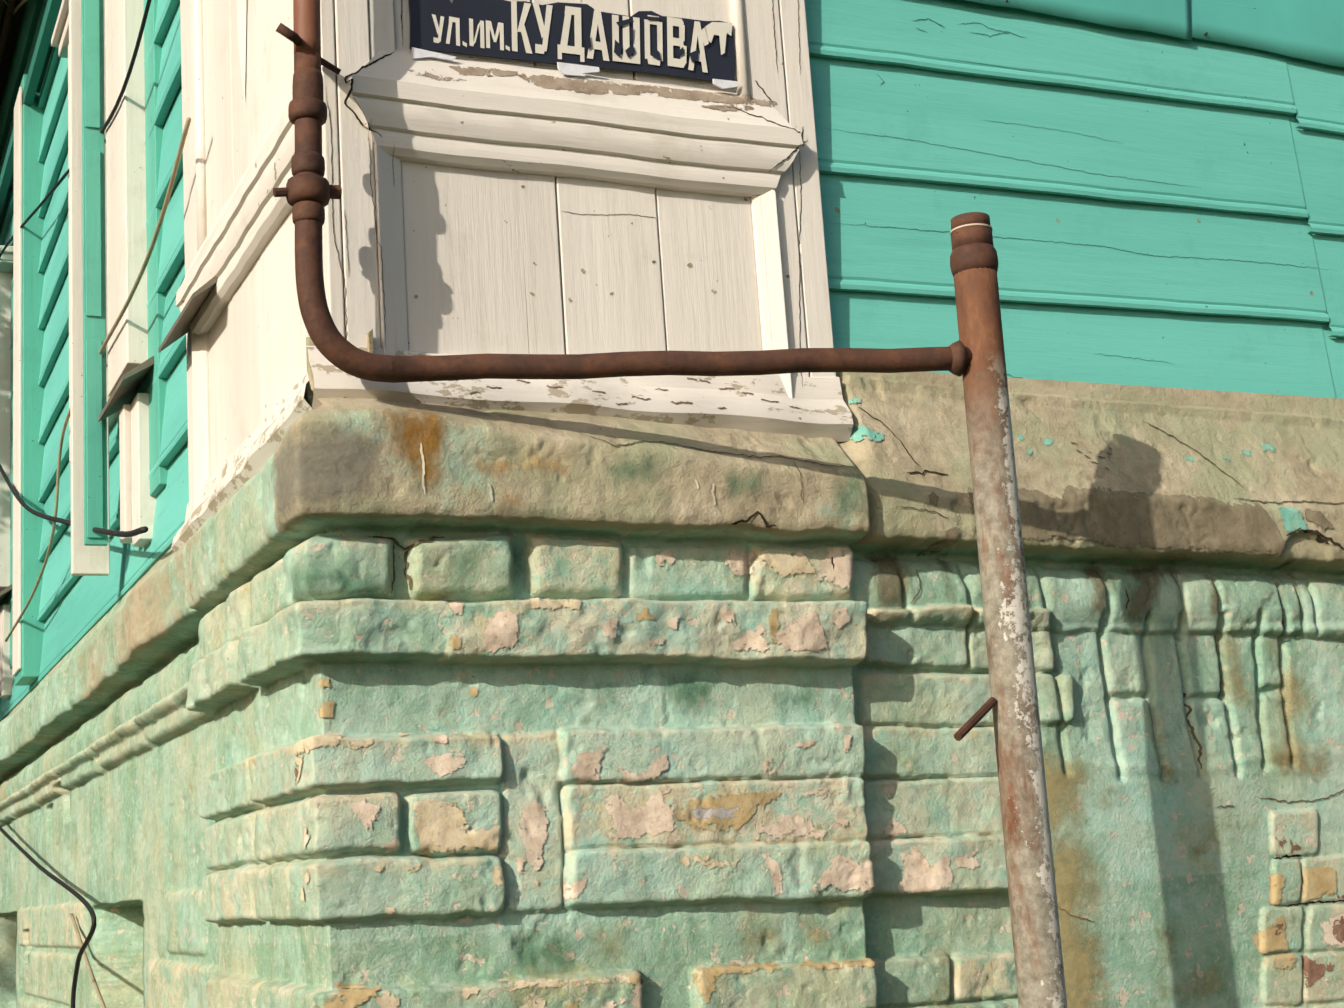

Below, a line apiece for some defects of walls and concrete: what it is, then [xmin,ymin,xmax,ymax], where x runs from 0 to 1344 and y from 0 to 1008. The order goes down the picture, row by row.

peeling [592,387,693,405]
peeling [687,378,800,409]
crack [1142,420,1344,549]
crack [368,536,444,593]
peeling [480,598,582,653]
peeling [722,546,853,652]
crack [1175,635,1231,769]
peeling [571,745,848,896]
peeling [812,854,875,896]
peeling [884,818,980,898]
peeling [1252,866,1344,988]
peeling [498,943,643,1008]